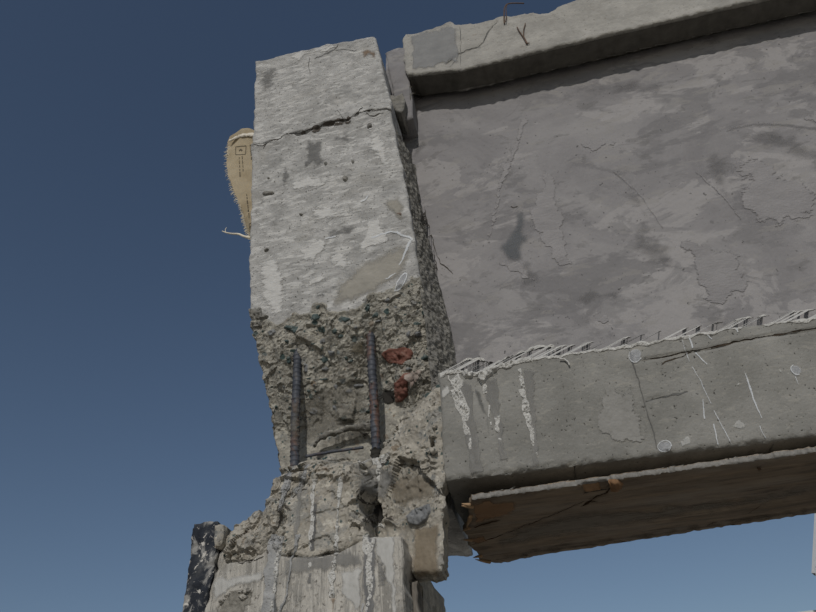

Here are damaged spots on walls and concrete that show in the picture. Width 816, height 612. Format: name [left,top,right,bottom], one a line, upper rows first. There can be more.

crack [252,107,391,147]
water stain [500,171,573,280]
spalling [223,276,450,583]
water stain [357,453,390,481]
water stain [440,309,816,473]
crack [630,328,816,448]
water stain [214,463,396,612]